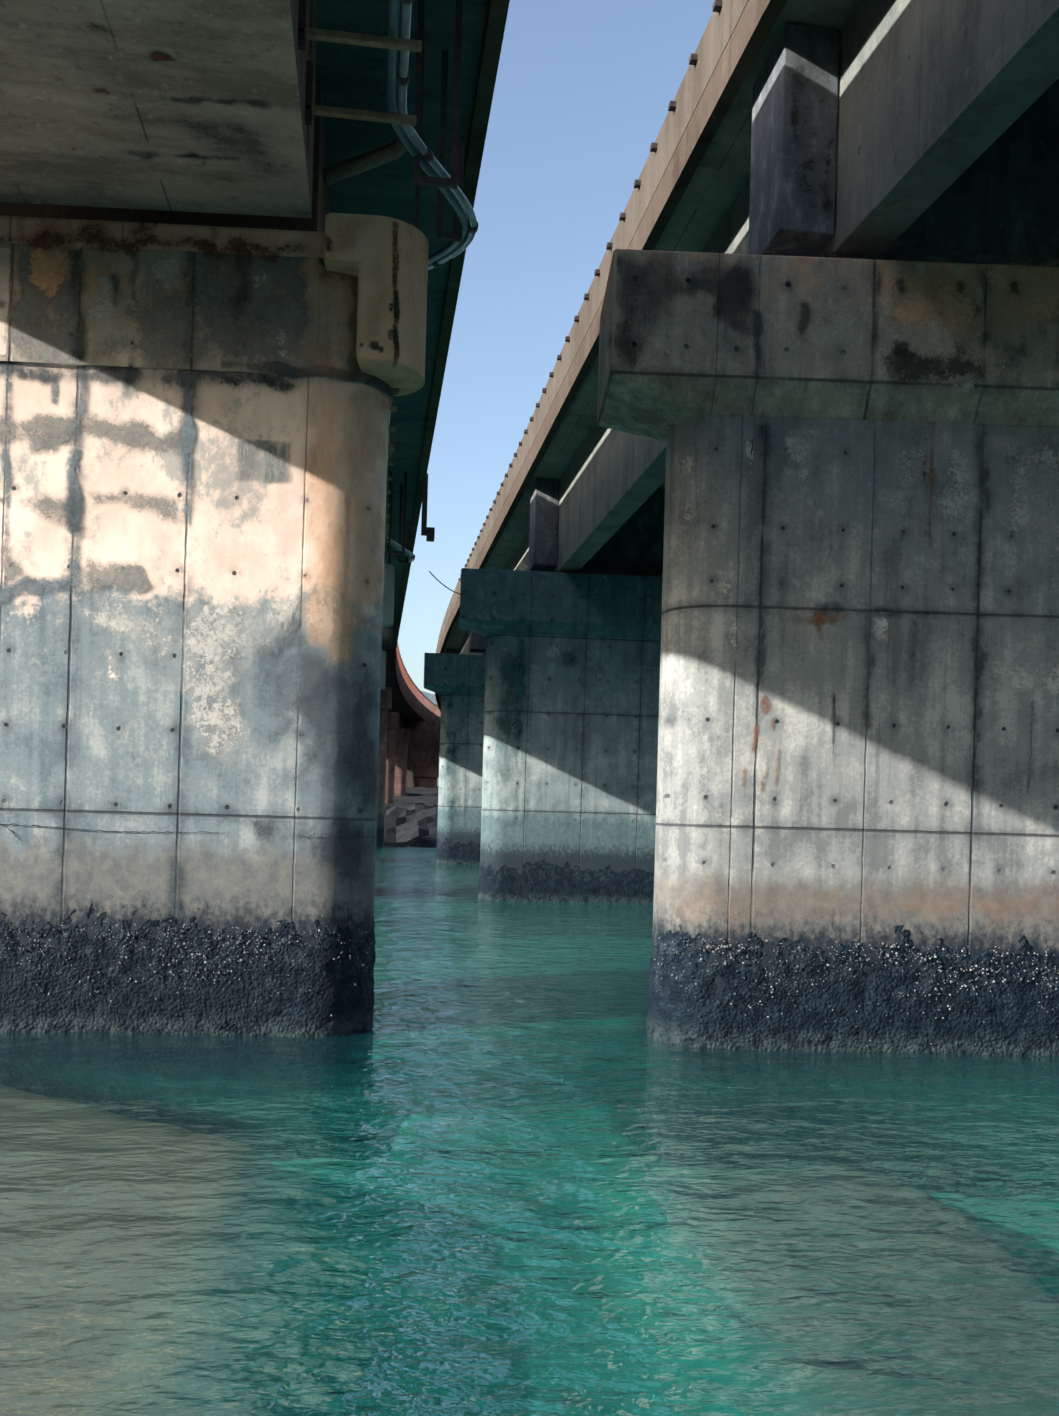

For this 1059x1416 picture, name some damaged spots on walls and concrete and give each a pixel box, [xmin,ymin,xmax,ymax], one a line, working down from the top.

corrosion [1,221,302,263]
water stain [614,259,989,404]
water stain [0,247,399,807]
water stain [254,820,273,840]
water stain [300,826,367,883]
water stain [166,856,183,918]